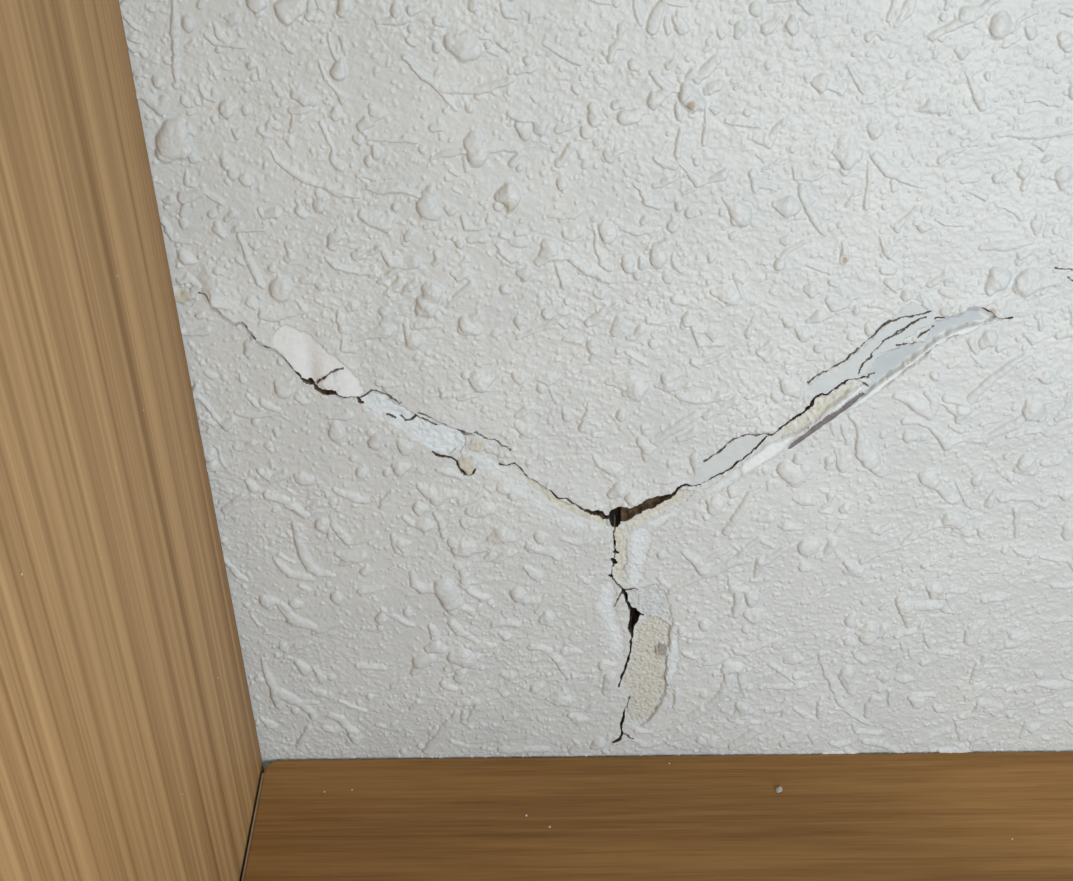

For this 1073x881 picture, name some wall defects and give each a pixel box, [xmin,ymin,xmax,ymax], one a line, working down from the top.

crack [238,307,1013,743]
flaking render [270,302,994,726]